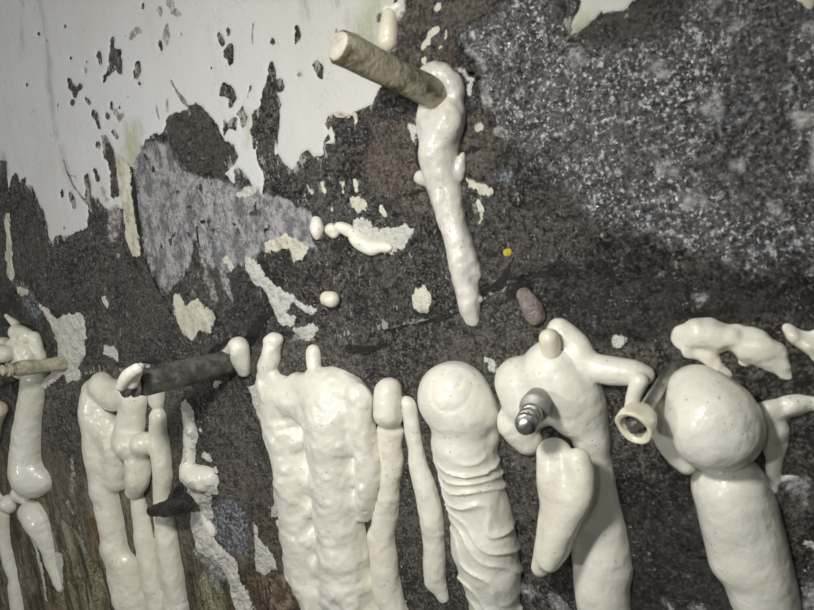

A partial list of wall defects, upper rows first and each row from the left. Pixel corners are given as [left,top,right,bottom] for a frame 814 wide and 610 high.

peeling [84,37,122,83]
peeling [217,28,233,65]
peeling [0,61,459,376]
peeling [389,0,814,300]